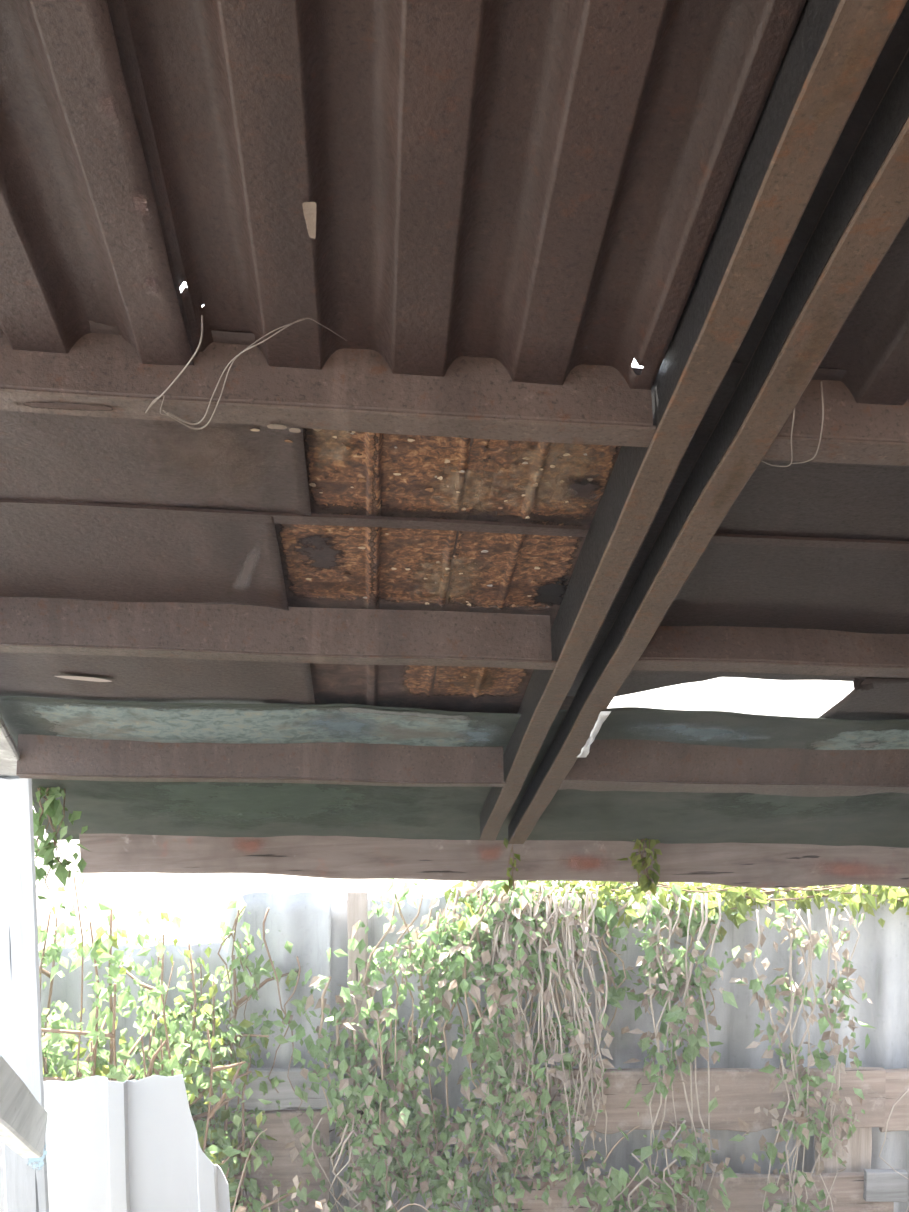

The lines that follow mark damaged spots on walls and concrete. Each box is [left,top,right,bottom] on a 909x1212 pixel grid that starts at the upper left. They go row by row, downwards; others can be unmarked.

corrosion [267,424,619,610]
corrosion [403,665,528,698]